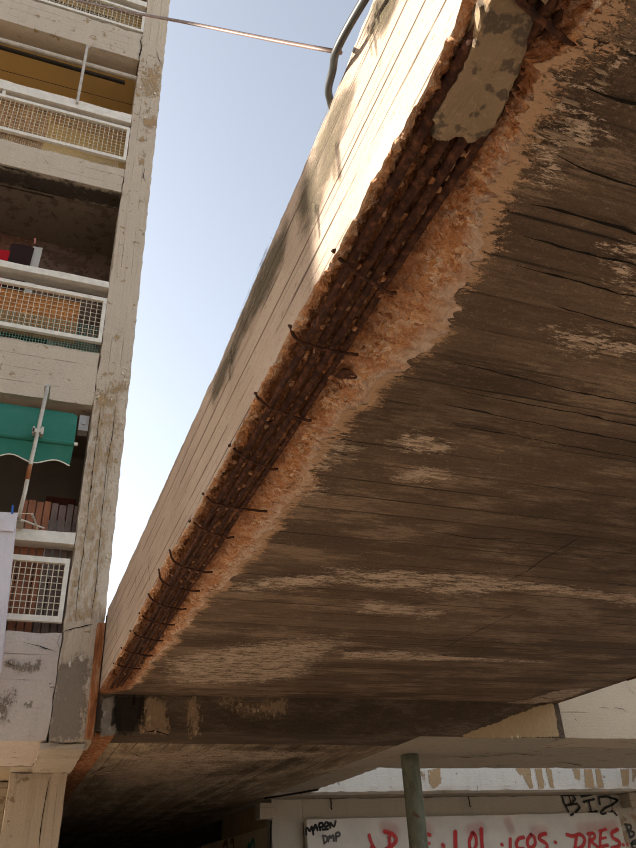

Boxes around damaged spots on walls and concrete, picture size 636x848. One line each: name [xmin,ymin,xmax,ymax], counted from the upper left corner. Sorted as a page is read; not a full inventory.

damp [297,84,353,238]
damp [0,165,121,209]
damp [212,226,287,401]
spalling [99,0,636,740]
peeling [69,369,130,622]
peeling [5,658,46,674]
peeling [49,652,93,747]
peeling [103,748,336,765]
peeling [420,768,441,788]
peeling [516,768,555,789]
peeling [573,769,604,788]
peeling [621,769,636,787]